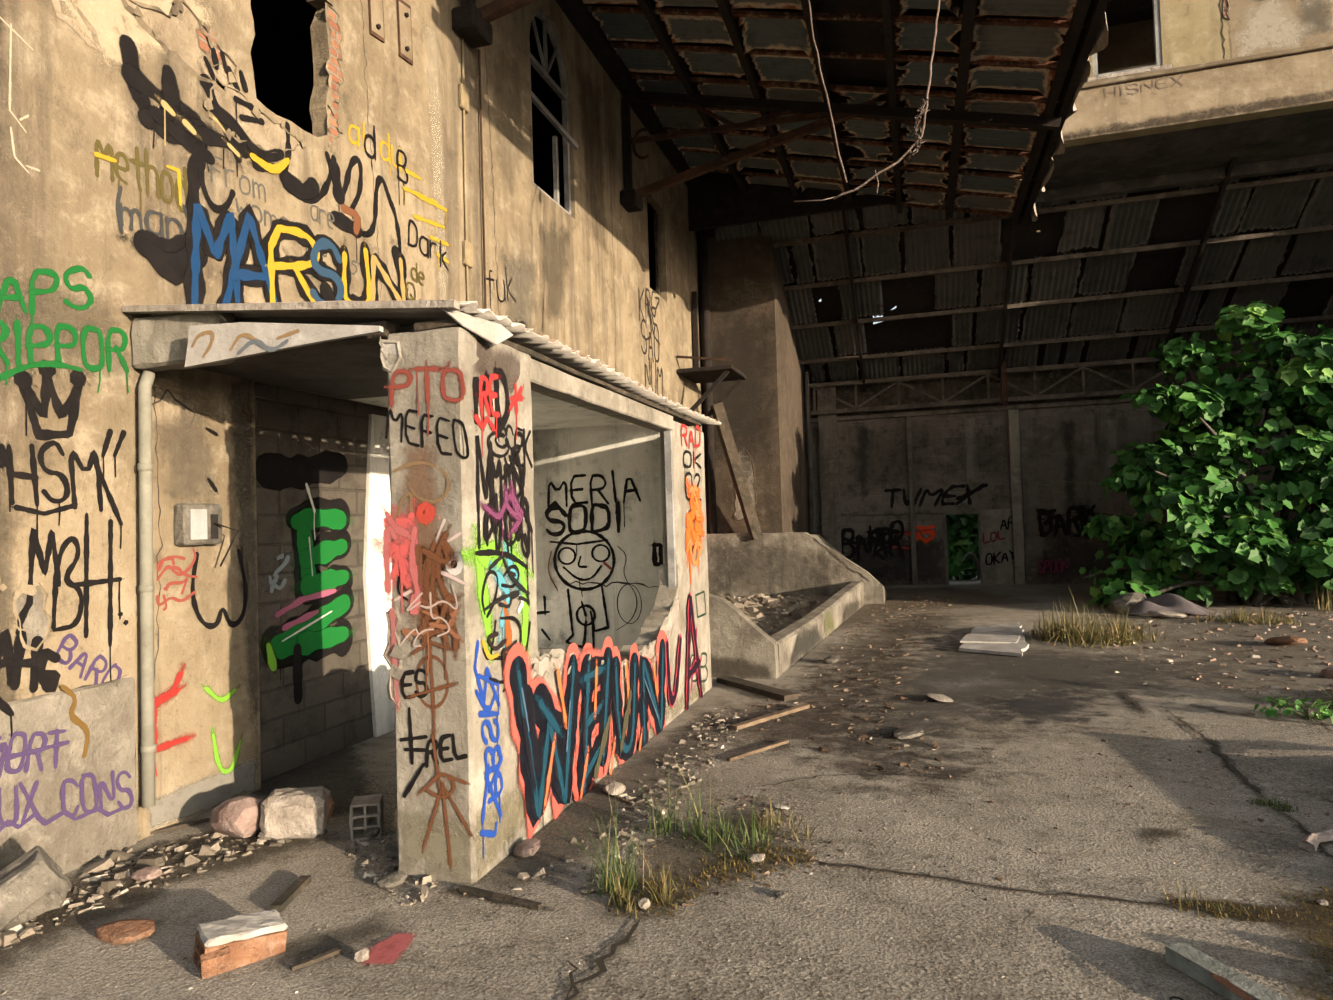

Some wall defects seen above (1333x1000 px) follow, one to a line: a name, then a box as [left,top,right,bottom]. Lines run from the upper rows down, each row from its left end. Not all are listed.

flaking render [1222,0,1333,58]
water stain [1301,0,1330,35]
spalling [52,0,308,153]
flaking render [325,2,345,147]
crack [1195,705,1255,716]
crack [565,913,647,1000]